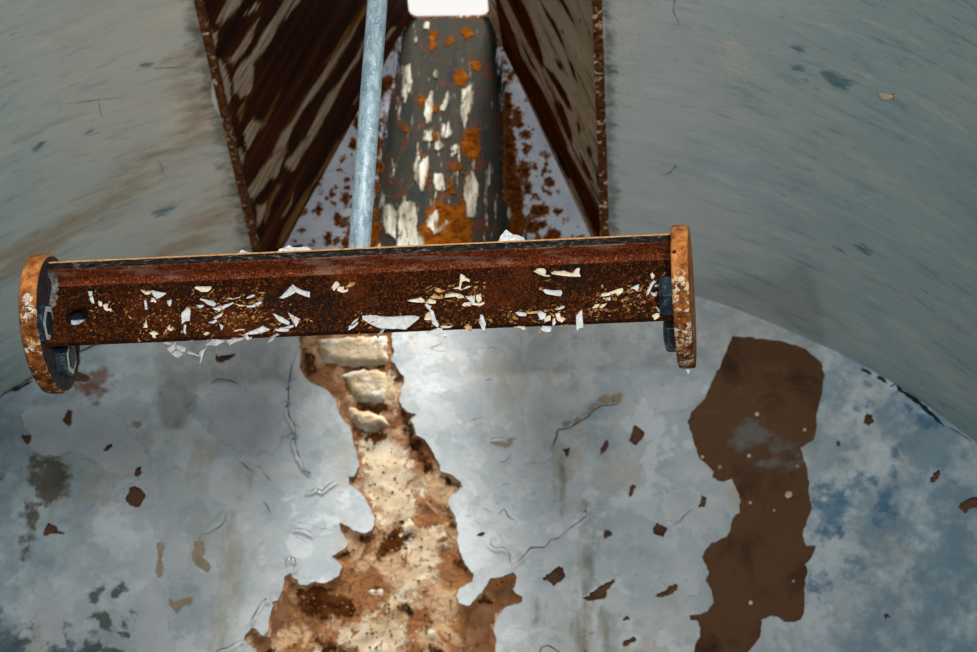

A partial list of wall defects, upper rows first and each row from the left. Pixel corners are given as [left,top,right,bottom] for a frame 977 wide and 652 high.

peeling [211,0,303,166]
peeling [247,1,367,229]
corrosion [293,115,358,248]
corrosion [370,120,396,247]
peeling [383,202,447,246]
peeling [413,91,459,191]
corrosion [418,127,482,245]
corrosion [495,0,609,239]
spalling [141,273,522,652]
damp [813,483,847,534]
crack [217,597,271,652]
damp [661,552,701,607]